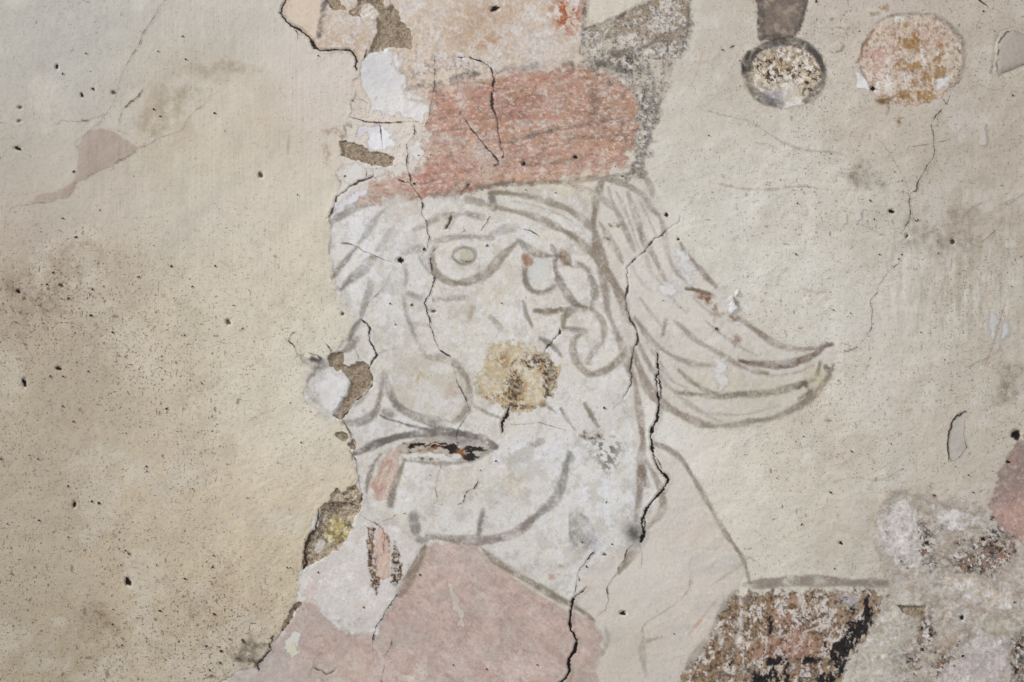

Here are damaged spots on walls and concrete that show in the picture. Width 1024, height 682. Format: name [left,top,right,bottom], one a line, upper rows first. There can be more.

peeling [326,0,432,218]
peeling [855,72,875,91]
peeling [936,76,949,90]
crack [351,57,504,356]
spalling [313,352,373,450]
crack [561,230,670,682]
peeling [947,411,967,467]
spalling [286,485,363,573]
peeling [949,517,1017,577]
peeling [282,602,302,657]
peeling [897,605,964,682]
peeling [1010,636,1024,682]